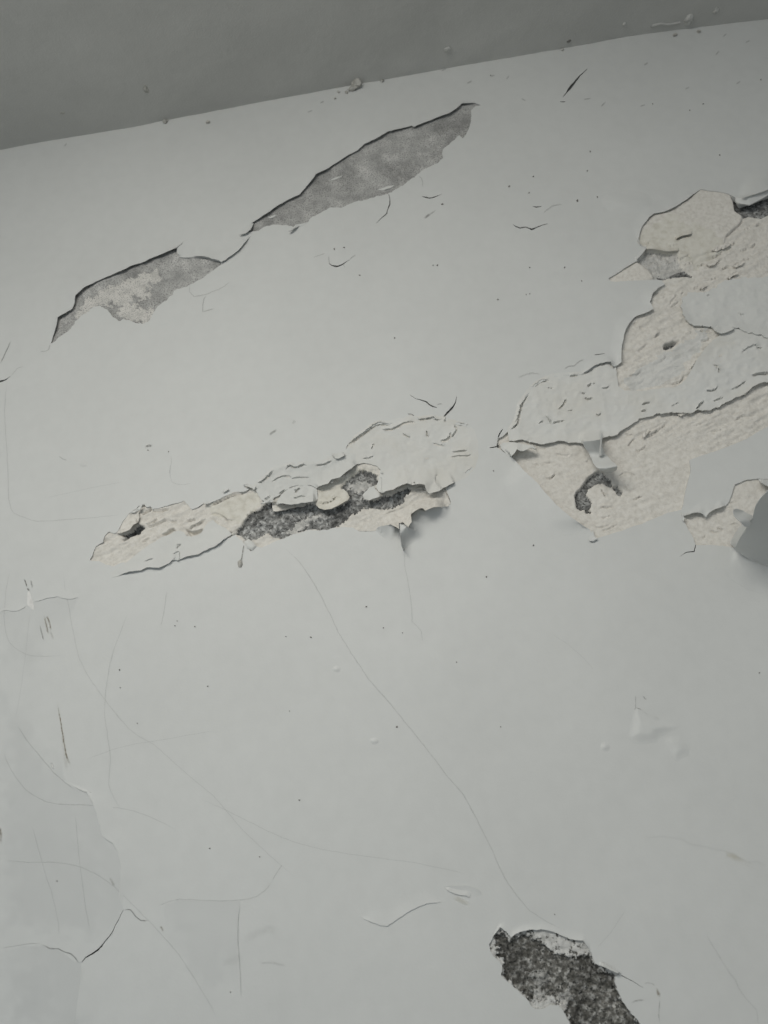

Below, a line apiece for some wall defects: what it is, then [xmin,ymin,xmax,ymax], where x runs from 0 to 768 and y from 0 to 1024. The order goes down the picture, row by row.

peeling [48,92,480,343]
peeling [493,157,768,596]
spalling [91,414,479,578]
crack [82,909,144,962]
spalling [489,919,640,1024]